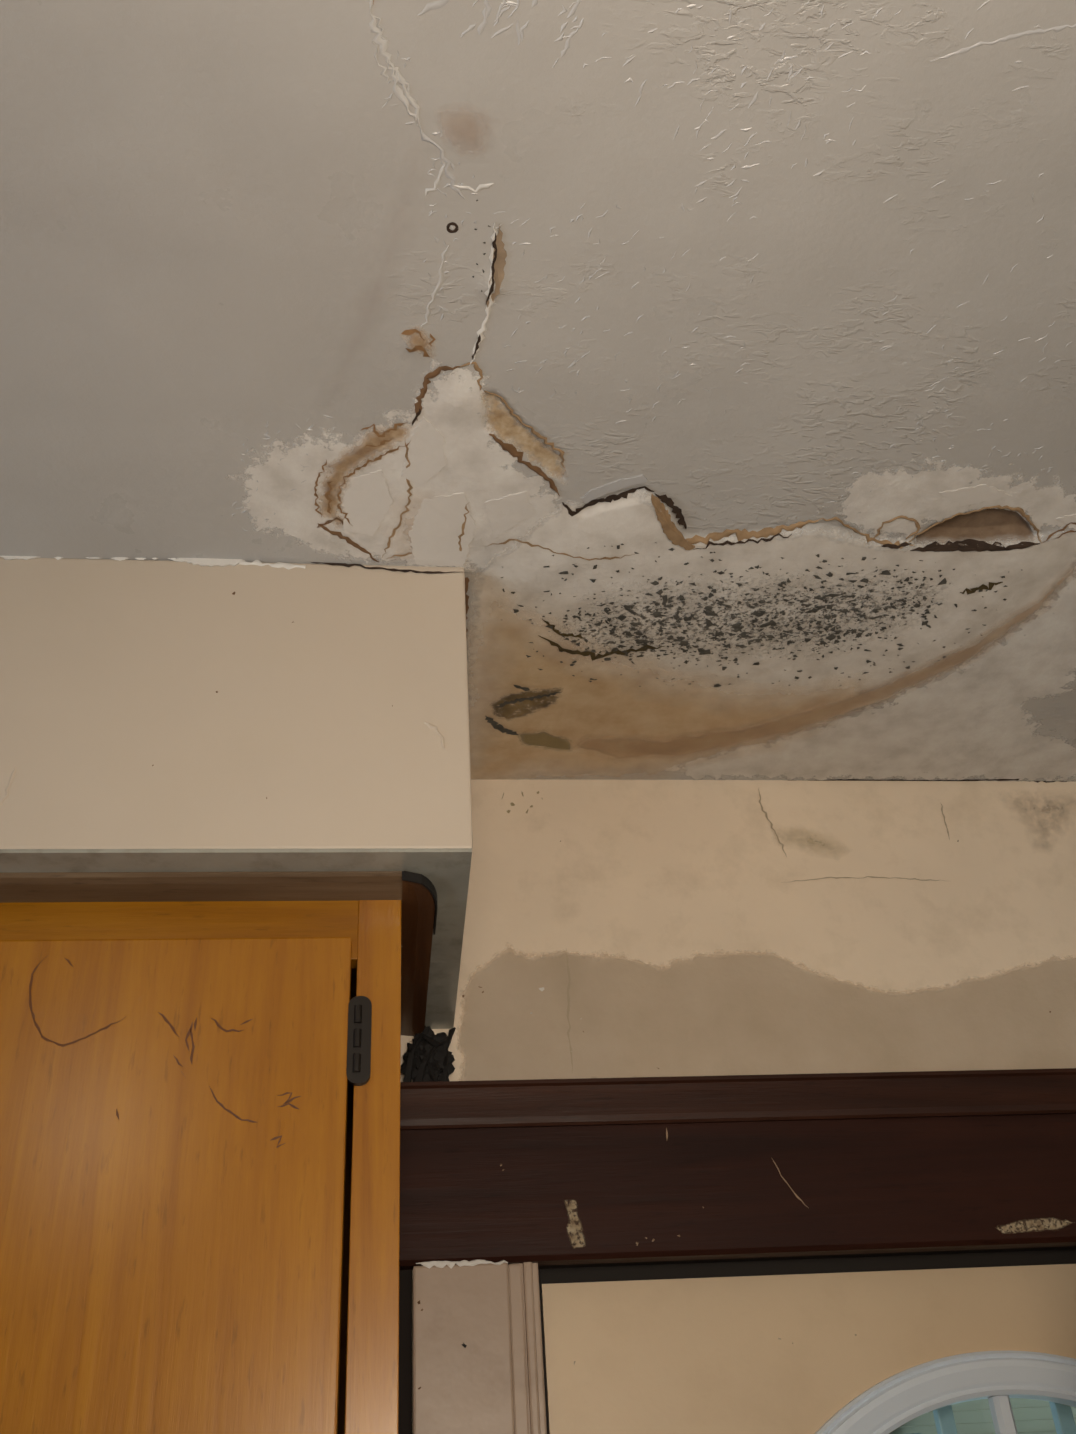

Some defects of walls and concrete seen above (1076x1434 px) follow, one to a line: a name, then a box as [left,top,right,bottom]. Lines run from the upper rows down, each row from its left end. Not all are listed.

crack [311,0,633,637]
peeling [88,557,306,570]
peeling [226,360,574,579]
crack [562,475,920,550]
peeling [836,458,1076,552]
damp [470,544,1035,813]
peeling [661,566,1076,782]